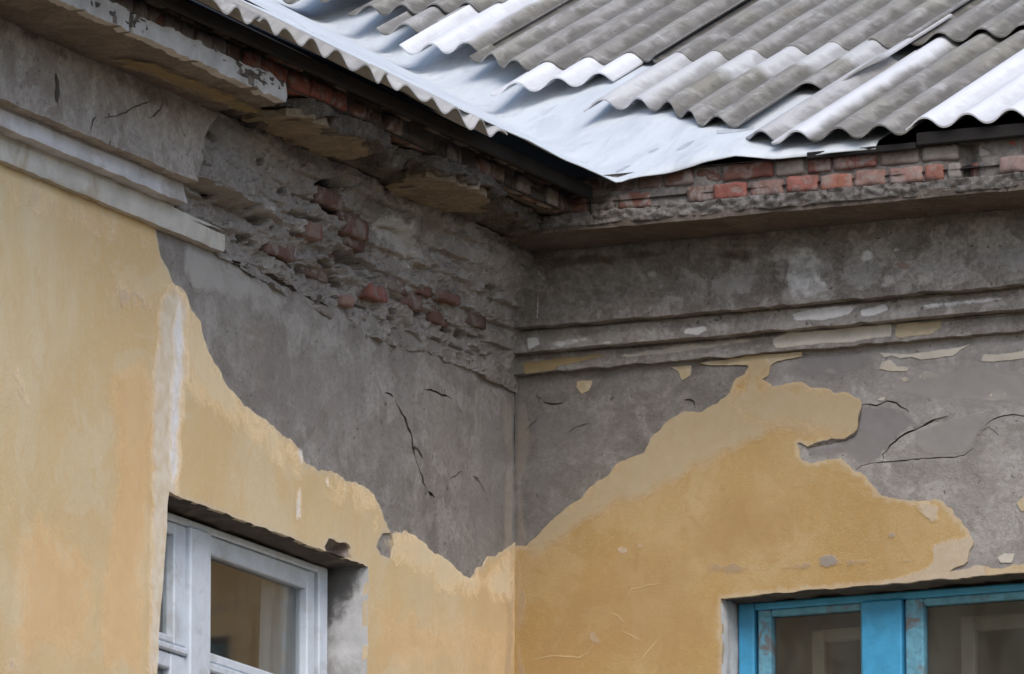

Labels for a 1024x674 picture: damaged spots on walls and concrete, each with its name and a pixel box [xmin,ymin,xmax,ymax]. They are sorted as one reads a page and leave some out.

peeling [119,59,258,113]
crack [424,389,450,398]
peeling [149,112,1024,674]
crack [386,392,485,498]
crack [799,400,1024,469]